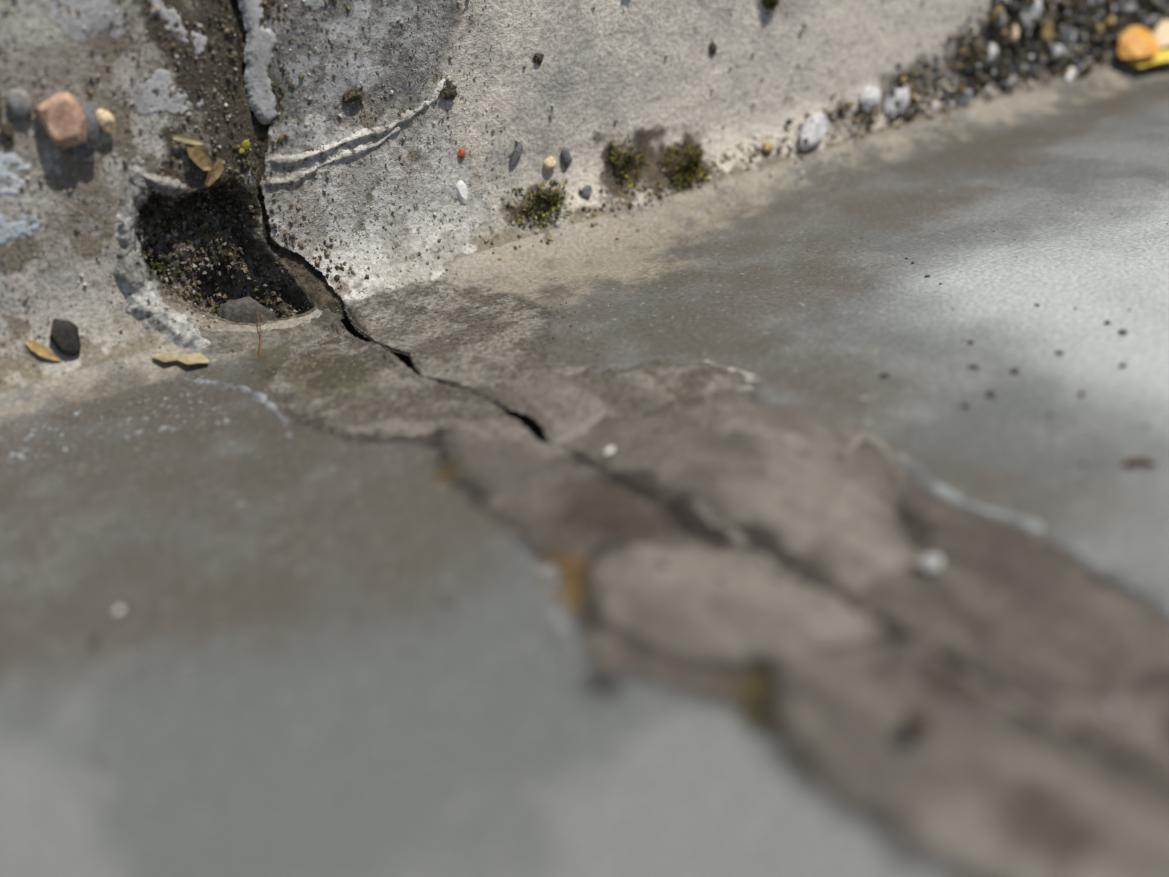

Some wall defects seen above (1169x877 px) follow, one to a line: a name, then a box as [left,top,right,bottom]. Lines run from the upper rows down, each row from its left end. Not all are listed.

peeling [47,0,126,42]
peeling [151,0,207,55]
peeling [238,0,429,125]
peeling [112,69,207,117]
spalling [133,175,318,327]
crack [229,0,658,505]
peeling [331,306,371,342]
peeling [383,351,430,372]